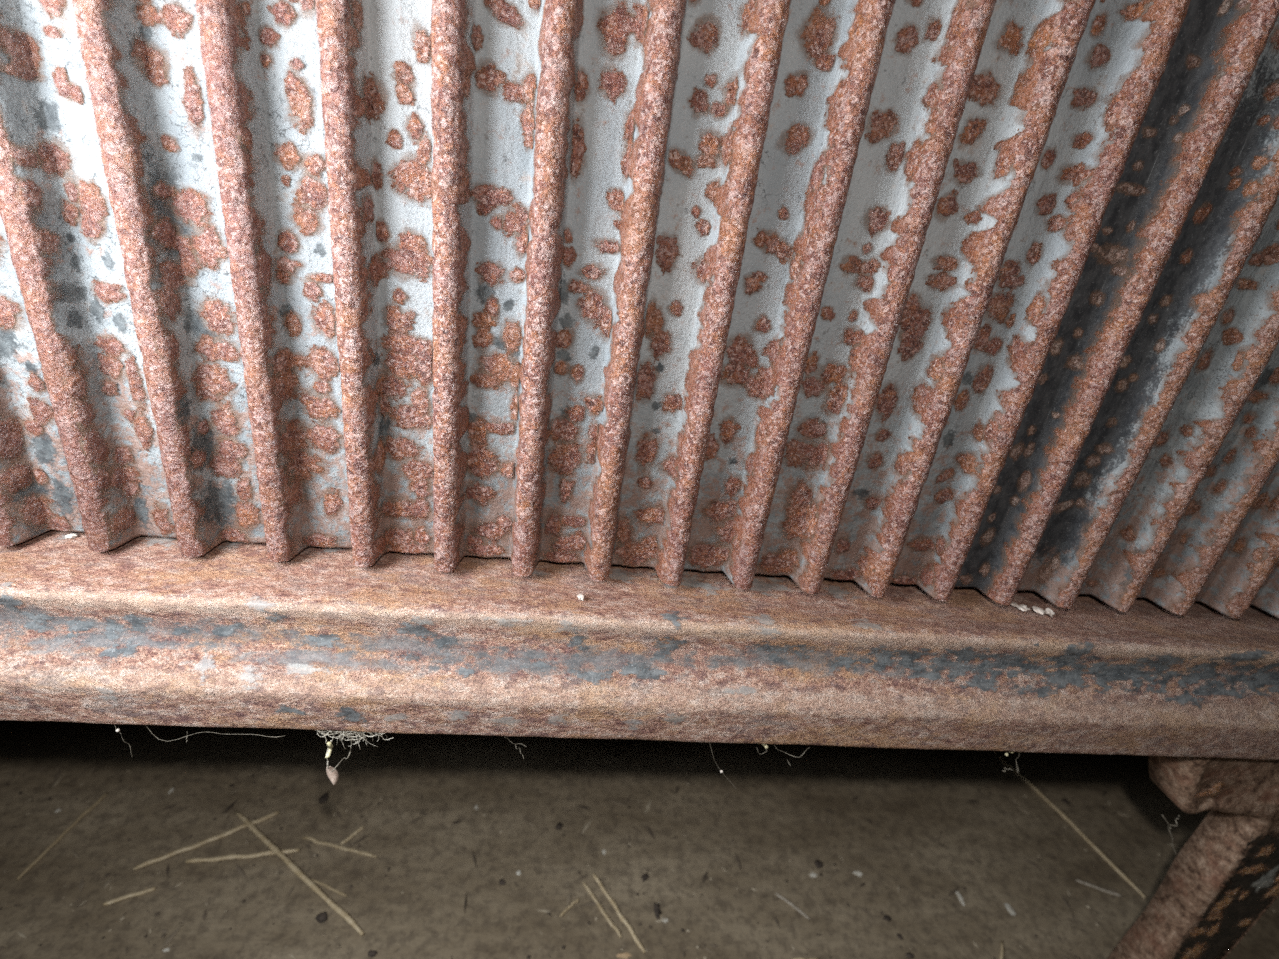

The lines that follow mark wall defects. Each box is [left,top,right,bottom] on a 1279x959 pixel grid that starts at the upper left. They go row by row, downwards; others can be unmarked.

corrosion [1180,844,1279,959]